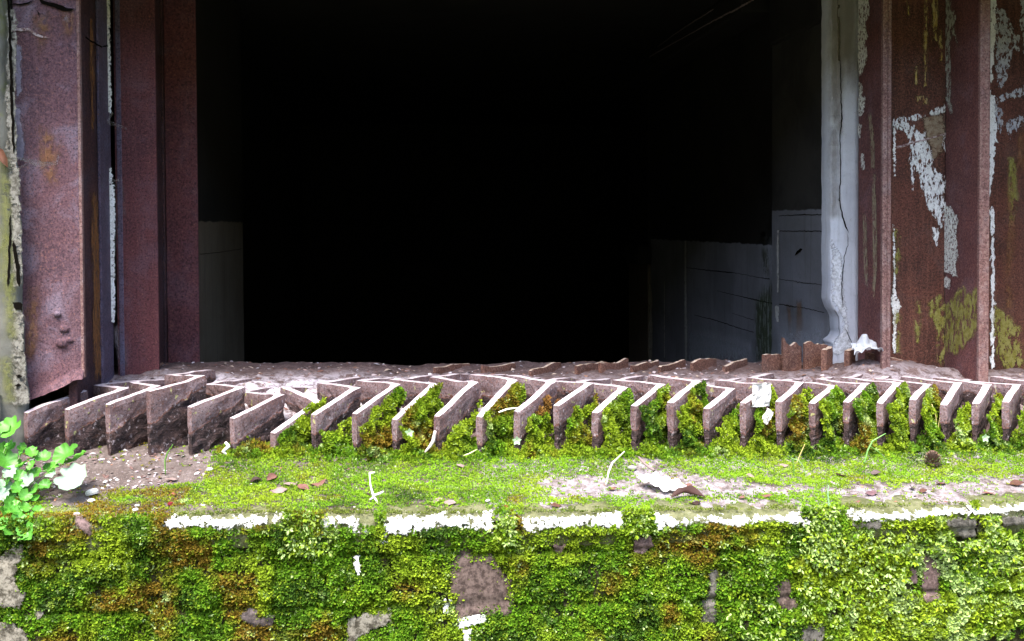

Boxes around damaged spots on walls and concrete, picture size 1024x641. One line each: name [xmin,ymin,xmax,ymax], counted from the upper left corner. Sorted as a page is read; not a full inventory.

crack [686,5,852,332]
rust [863,113,877,297]
peeling [892,0,959,288]
rust [915,0,946,159]
peeling [989,0,1024,369]
rust [91,192,101,382]
spalling [0,544,26,610]
spalling [0,622,29,641]
spalling [450,548,515,621]
spalling [852,520,881,530]
spalling [946,516,981,539]
spalling [1002,514,1024,527]